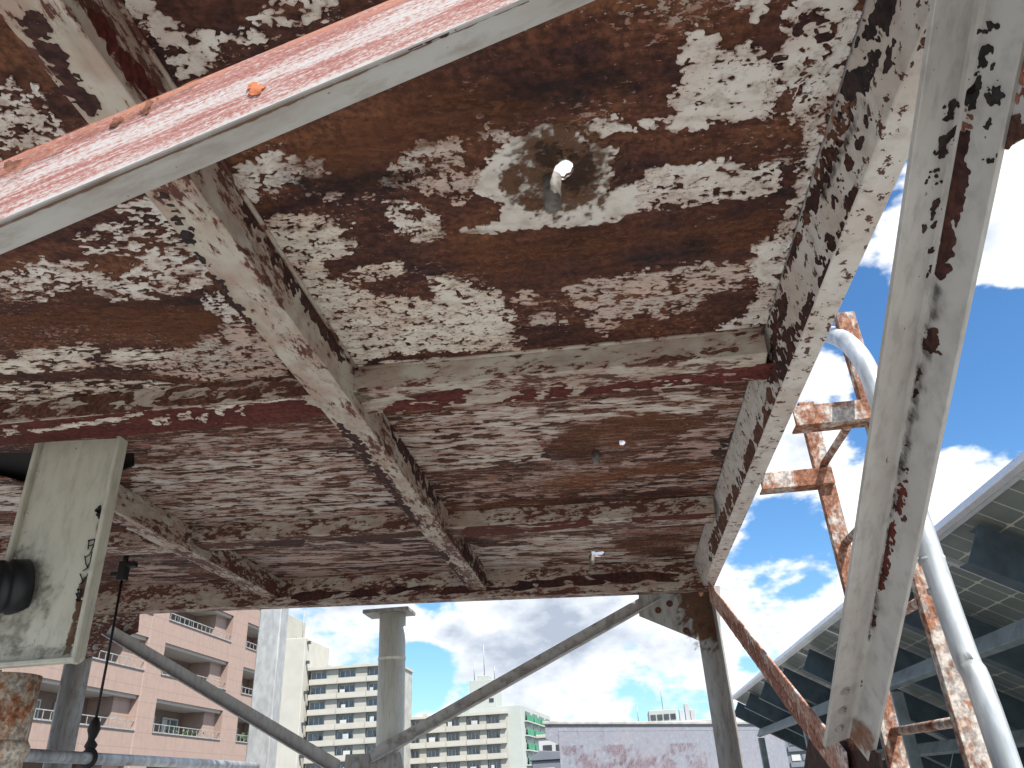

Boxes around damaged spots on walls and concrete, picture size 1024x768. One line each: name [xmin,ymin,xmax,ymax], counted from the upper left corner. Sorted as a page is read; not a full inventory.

peeling [125,0,339,82]
corrosion [0,1,529,228]
peeling [232,149,332,203]
peeling [264,0,862,367]
peeling [0,196,290,402]
corrosion [499,0,897,561]
peeling [388,386,744,509]
peeling [239,539,453,580]
corrosion [193,423,824,750]
peeling [470,531,700,569]
corrosion [878,466,909,592]